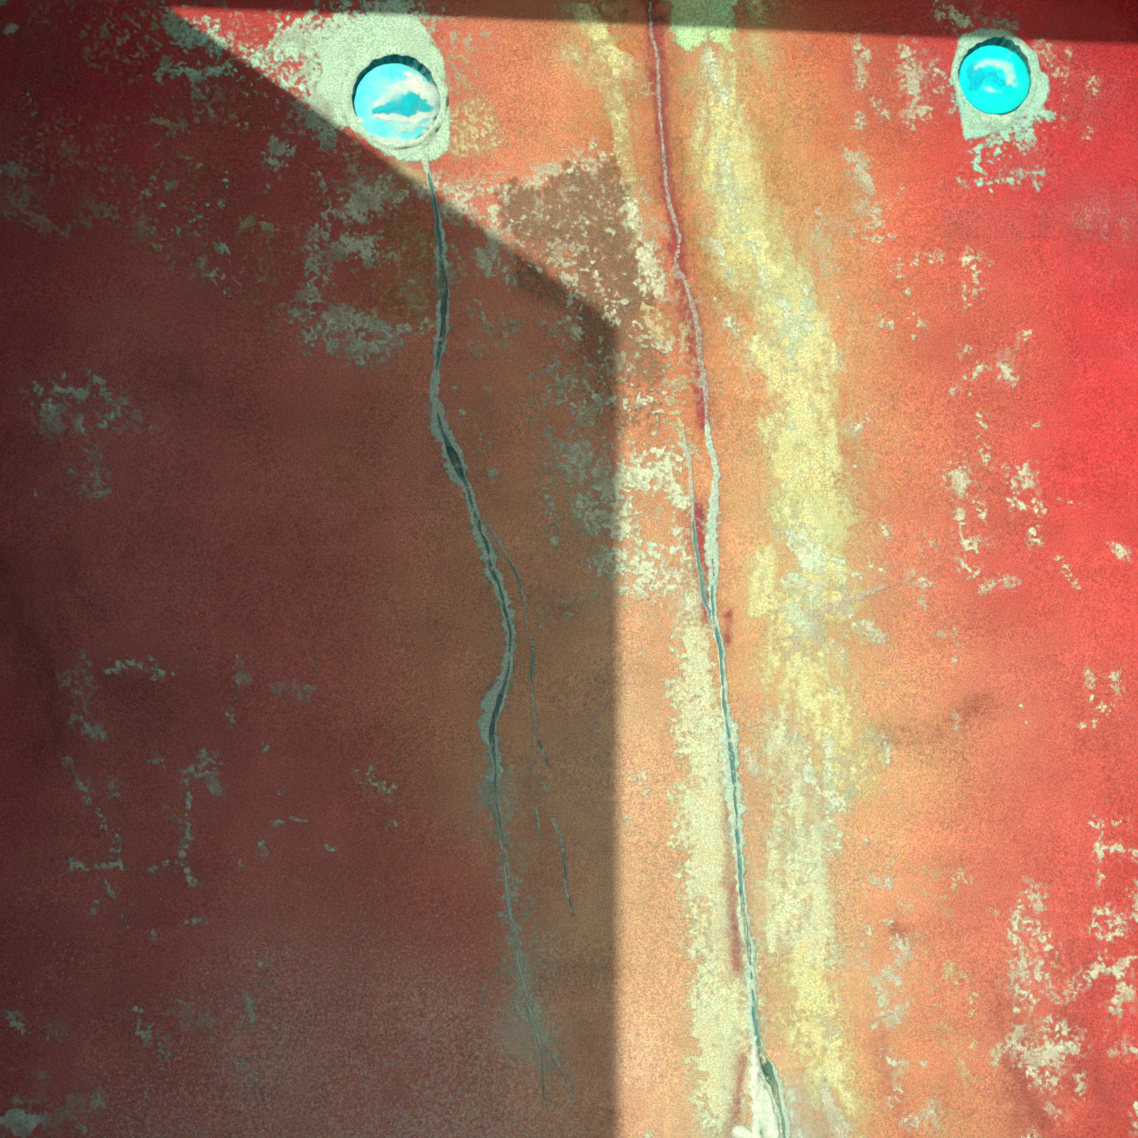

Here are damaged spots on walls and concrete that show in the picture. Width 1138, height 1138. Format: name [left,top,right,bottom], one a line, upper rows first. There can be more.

peeling [261,135,295,171]
peeling [126,0,471,156]
peeling [840,149,894,244]
peeling [855,45,1063,193]
peeling [933,0,1016,61]
peeling [30,370,133,454]
peeling [279,83,695,613]
crack [422,156,574,1106]
damp [495,0,886,1138]
crack [648,1,791,1138]
peeling [1089,822,1138,884]
peeling [991,885,1138,1087]